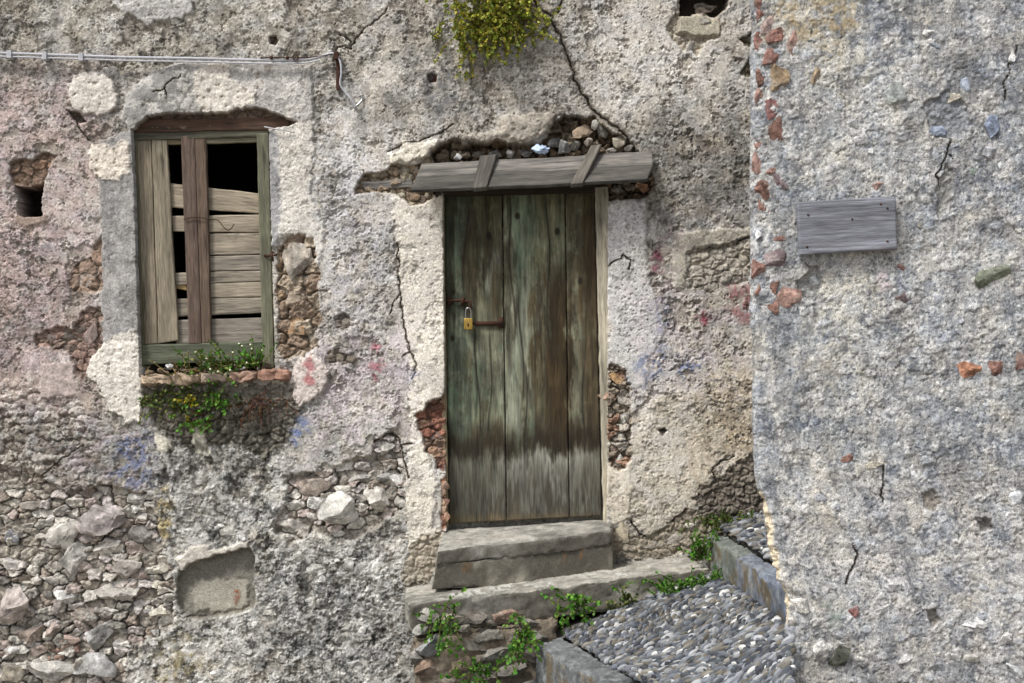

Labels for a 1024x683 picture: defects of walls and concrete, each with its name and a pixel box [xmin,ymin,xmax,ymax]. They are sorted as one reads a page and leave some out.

crack [336,9,387,50]
flaking render [667,0,727,56]
crack [532,0,636,152]
spalling [356,117,634,205]
crack [935,138,953,185]
flaking render [35,308,103,379]
flaking render [276,234,356,364]
crack [391,243,417,378]
flaking render [275,432,405,543]
crack [878,466,886,502]
flaking render [0,464,175,683]
crack [846,546,858,584]